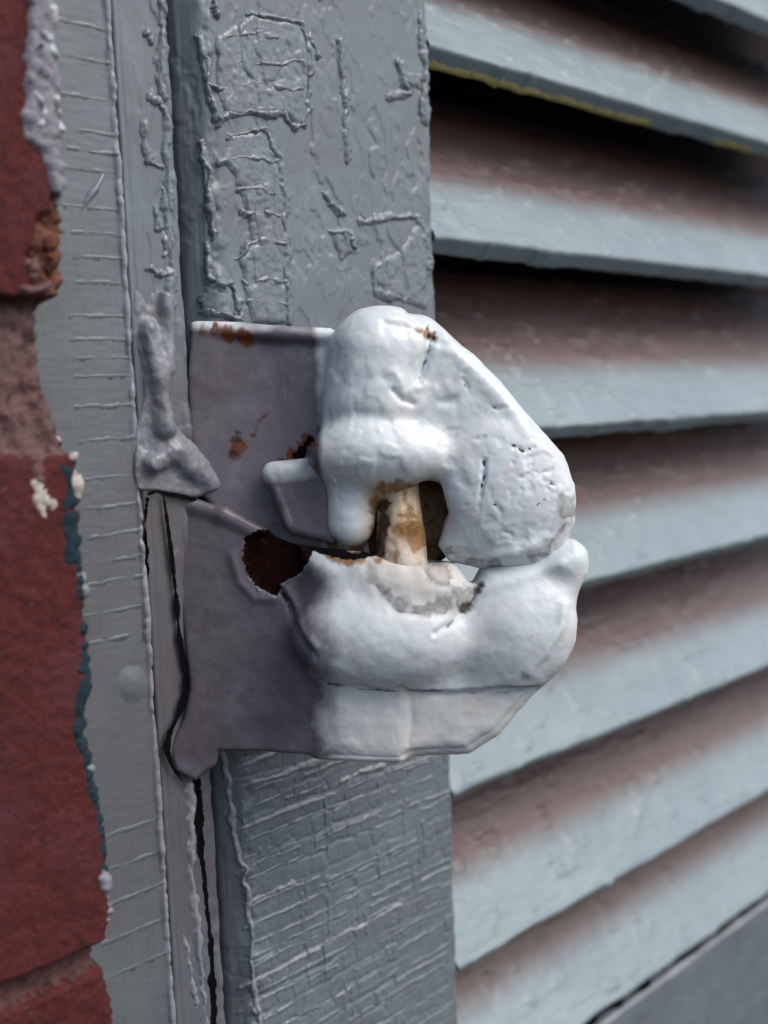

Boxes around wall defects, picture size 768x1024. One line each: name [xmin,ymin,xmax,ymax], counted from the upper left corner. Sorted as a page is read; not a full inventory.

crack [59,16,106,32]
crack [60,91,107,102]
peeling [19,0,68,296]
crack [65,126,119,175]
crack [61,203,124,286]
rust [200,322,252,346]
crack [68,313,131,409]
crack [79,435,135,444]
rust [230,432,255,457]
rust [278,435,316,461]
rust [316,479,448,566]
crack [83,474,452,1024]